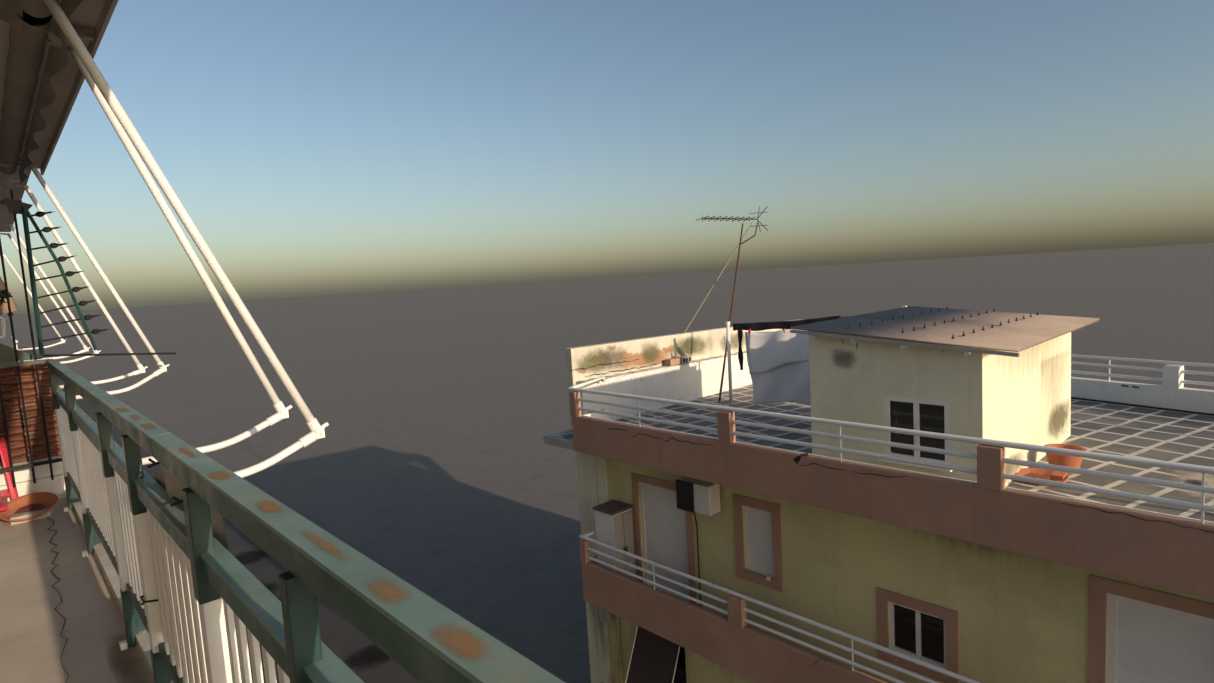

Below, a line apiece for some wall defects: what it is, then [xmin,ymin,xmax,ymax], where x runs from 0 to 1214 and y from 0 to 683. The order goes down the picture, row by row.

water stain [581,339,705,370]
water stain [1050,397,1214,434]
crack [606,427,713,445]
crack [799,463,907,478]
water stain [1005,457,1019,474]
crack [1063,503,1214,533]
corrosion [442,630,482,656]